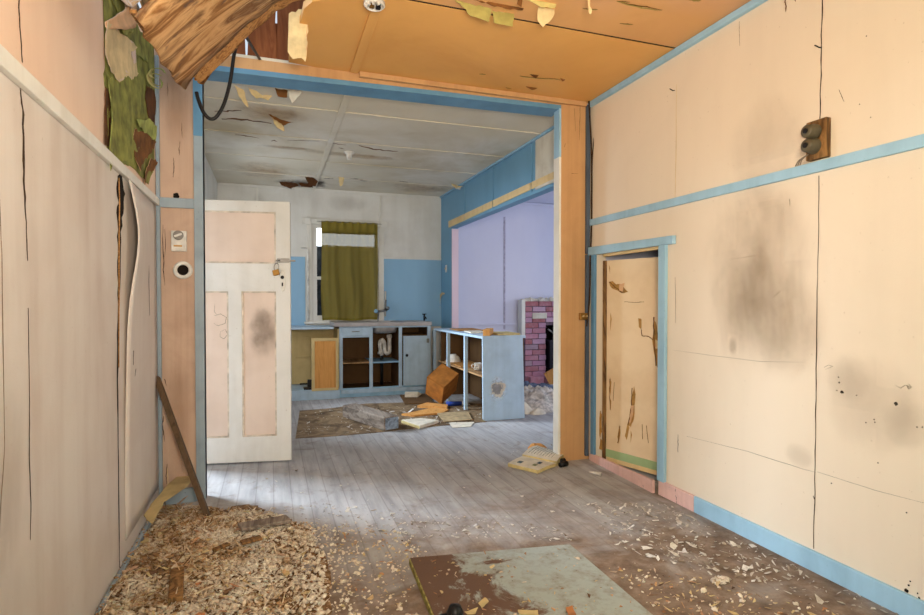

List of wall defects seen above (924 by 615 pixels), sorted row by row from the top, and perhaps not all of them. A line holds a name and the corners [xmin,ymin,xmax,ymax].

peeling [288,9,308,62]
peeling [455,0,556,27]
peeling [103,0,166,185]
peeling [609,266,628,293]
peeling [638,317,658,368]
peeling [617,388,649,443]